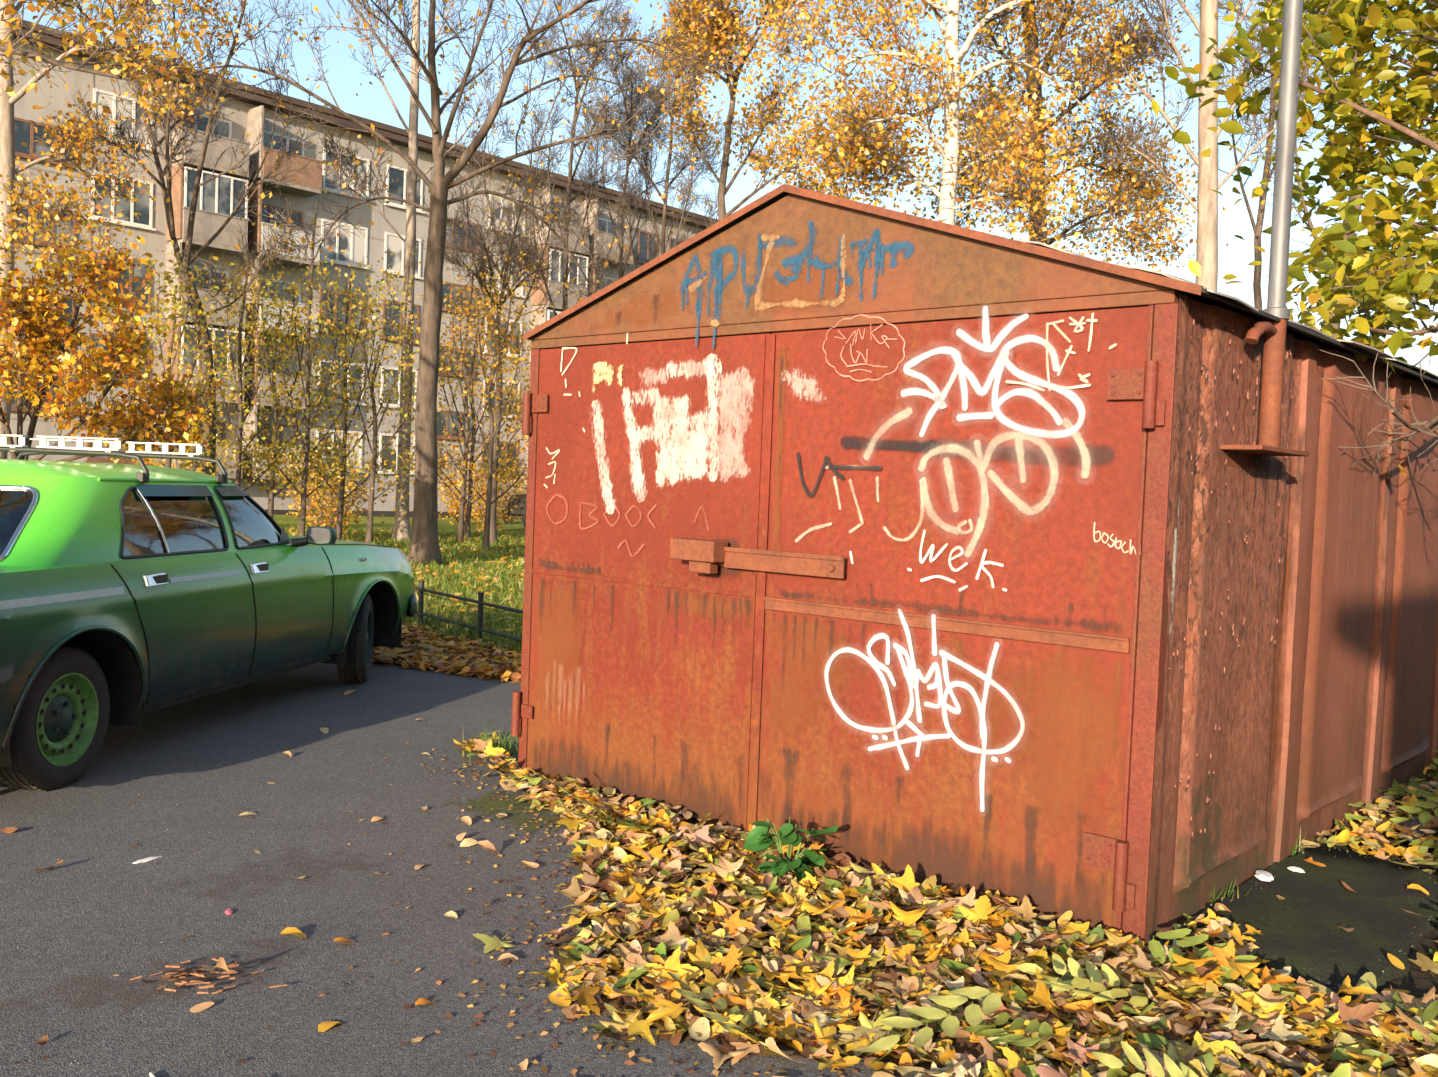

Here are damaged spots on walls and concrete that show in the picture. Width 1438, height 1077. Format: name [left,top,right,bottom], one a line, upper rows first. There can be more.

rust [770,270,847,305]
rust [1244,438,1302,516]
rust [540,560,600,574]
rust [936,592,978,616]